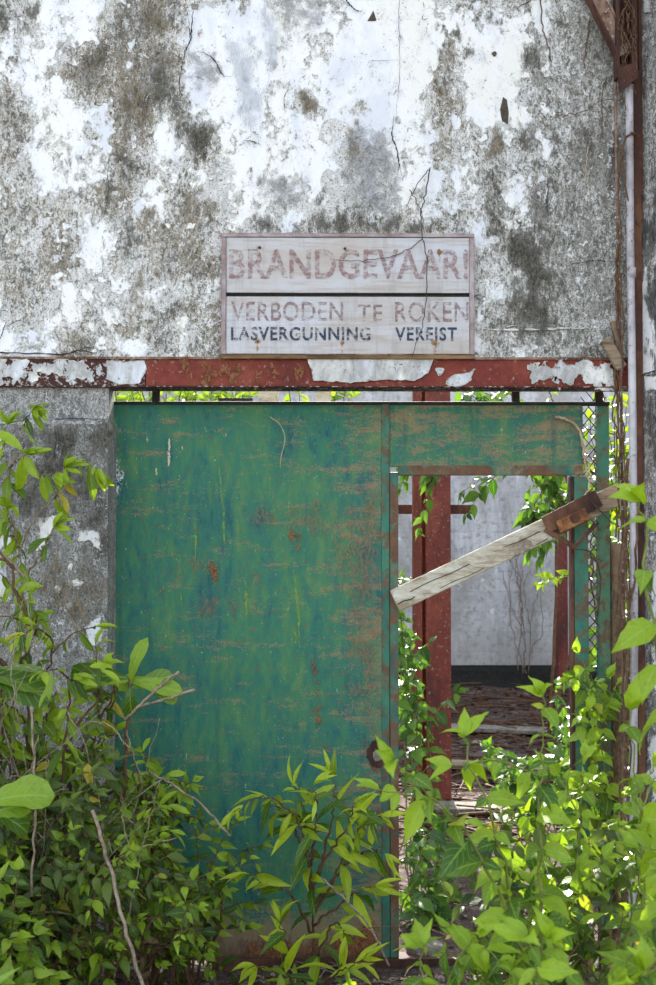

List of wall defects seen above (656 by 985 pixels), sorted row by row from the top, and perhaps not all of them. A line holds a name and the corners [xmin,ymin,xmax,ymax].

water stain [0,0,40,34]
water stain [94,6,221,157]
peeling [0,0,175,386]
water stain [102,171,114,213]
water stain [114,151,139,174]
water stain [180,187,218,215]
peeling [125,0,559,258]
flaking render [308,359,476,388]
peeling [475,264,531,357]
peeling [512,345,614,391]
water stain [641,158,656,376]
peeling [642,266,656,391]